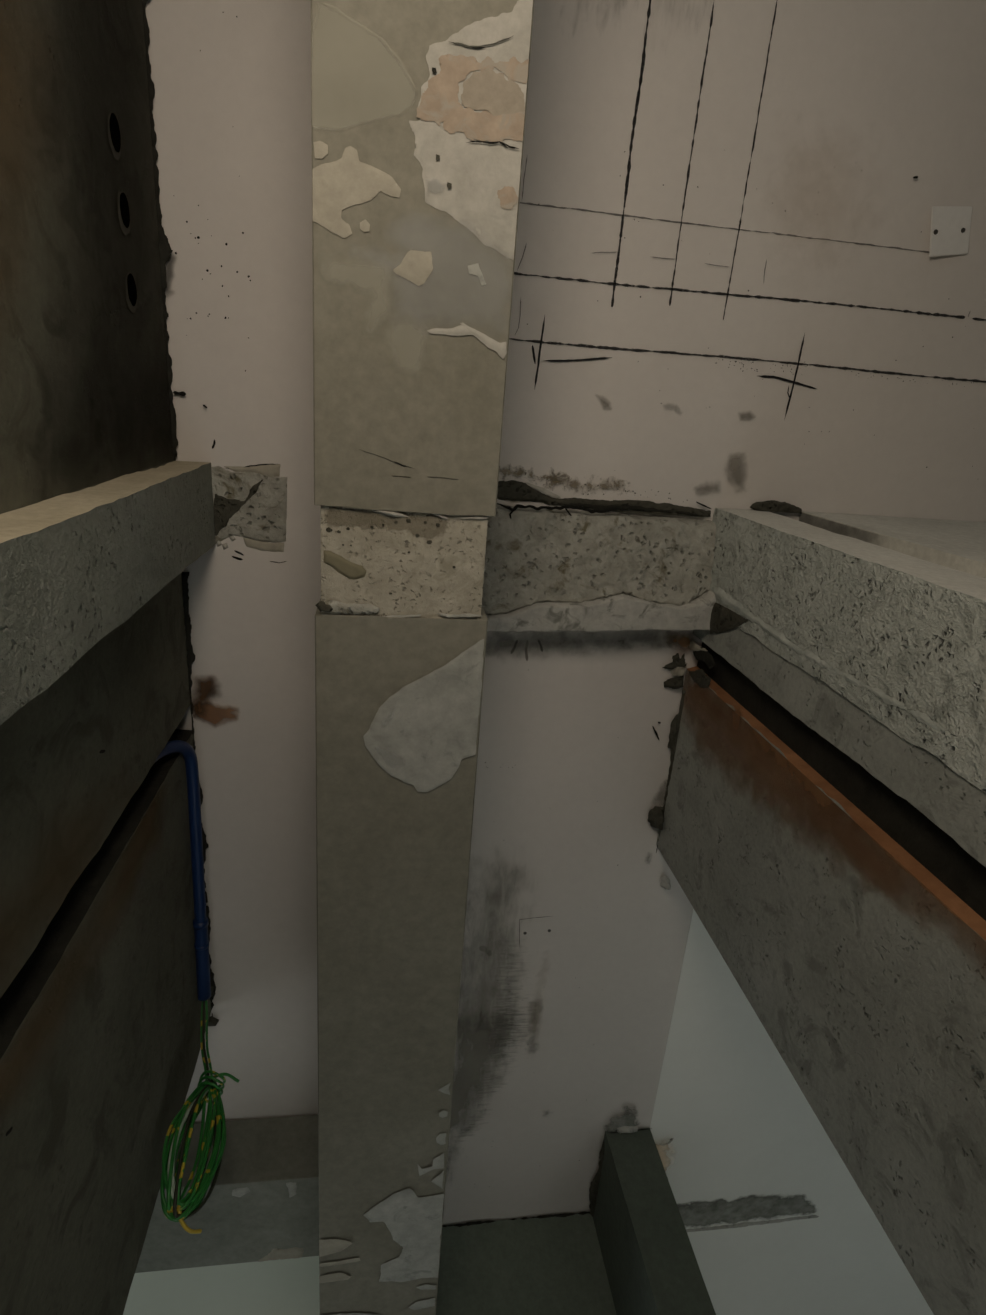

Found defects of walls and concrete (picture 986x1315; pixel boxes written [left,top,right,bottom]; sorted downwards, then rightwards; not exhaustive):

peeling [409,0,533,260]
peeling [427,322,507,359]
crack [497,503,632,519]
spalling [497,480,711,517]
spalling [315,600,421,619]
rust [193,677,237,726]
rust [684,677,986,957]
damp [450,985,503,1130]
peeling [364,1188,444,1310]